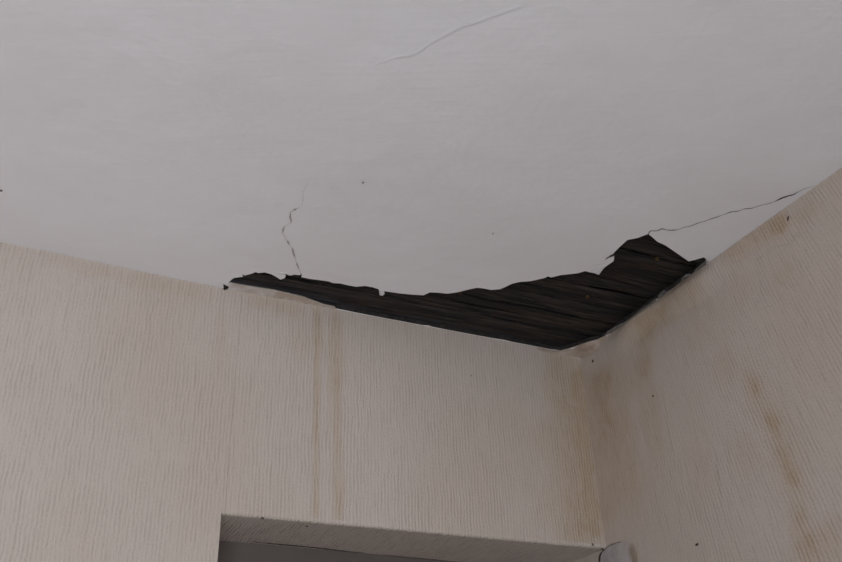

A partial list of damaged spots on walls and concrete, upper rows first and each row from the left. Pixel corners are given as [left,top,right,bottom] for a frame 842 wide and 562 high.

crack [282,177,311,274]
crack [647,187,811,234]
water stain [33,250,350,521]
water stain [522,193,824,545]
water stain [739,346,842,562]